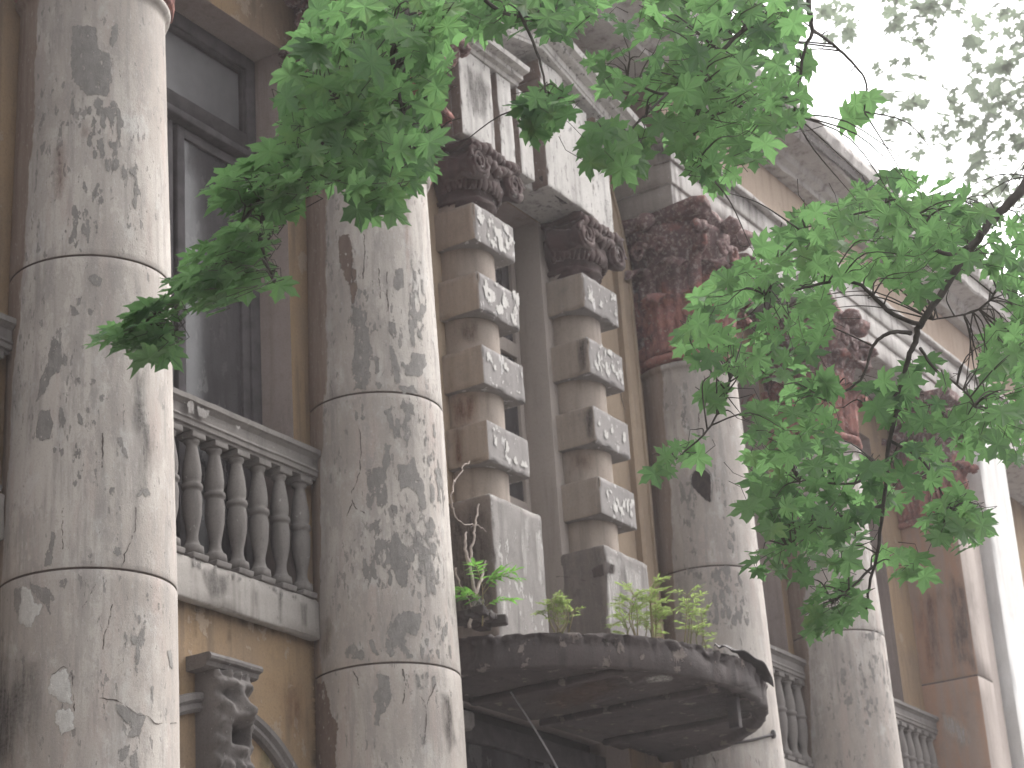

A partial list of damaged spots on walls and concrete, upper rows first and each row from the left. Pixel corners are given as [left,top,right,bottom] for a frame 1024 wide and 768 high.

peeling [55,24,141,252]
peeling [477,210,515,254]
peeling [588,286,617,317]
peeling [338,234,445,597]
crack [346,428,365,516]
peeling [14,578,67,617]
peeling [124,592,164,676]
flaking render [116,704,146,768]
crack [103,698,176,725]